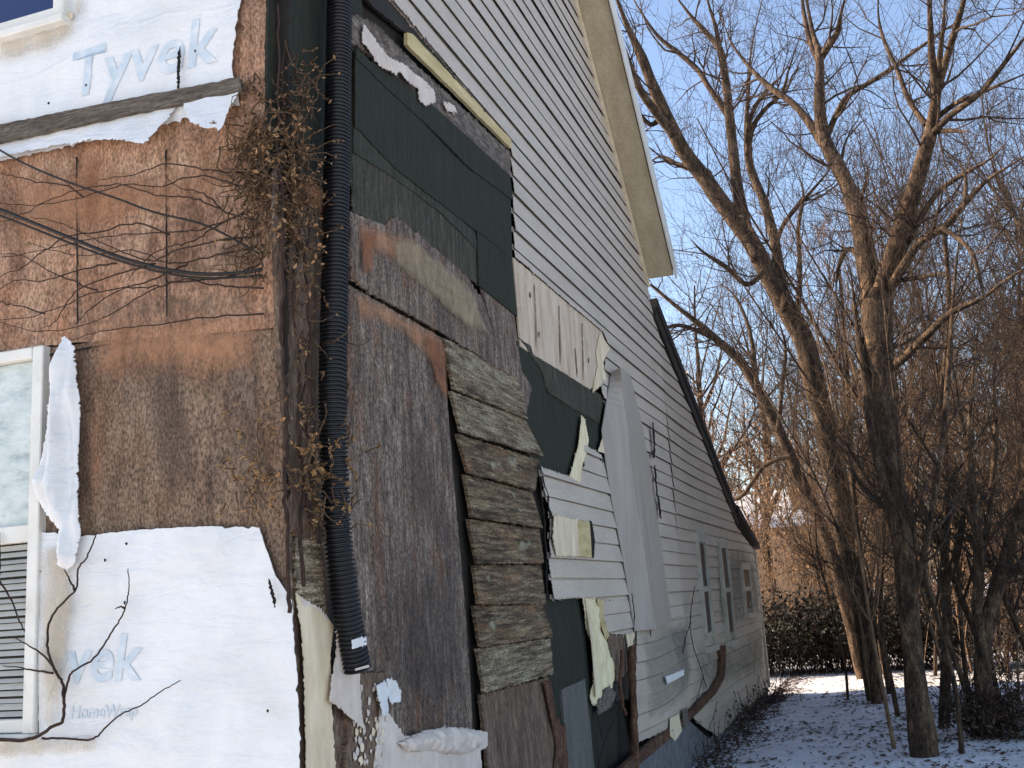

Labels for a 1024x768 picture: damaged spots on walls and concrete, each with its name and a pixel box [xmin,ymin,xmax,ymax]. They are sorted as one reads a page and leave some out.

peeling [362,23,457,115]
peeling [512,257,610,393]
peeling [552,514,595,559]
peeling [353,677,401,768]